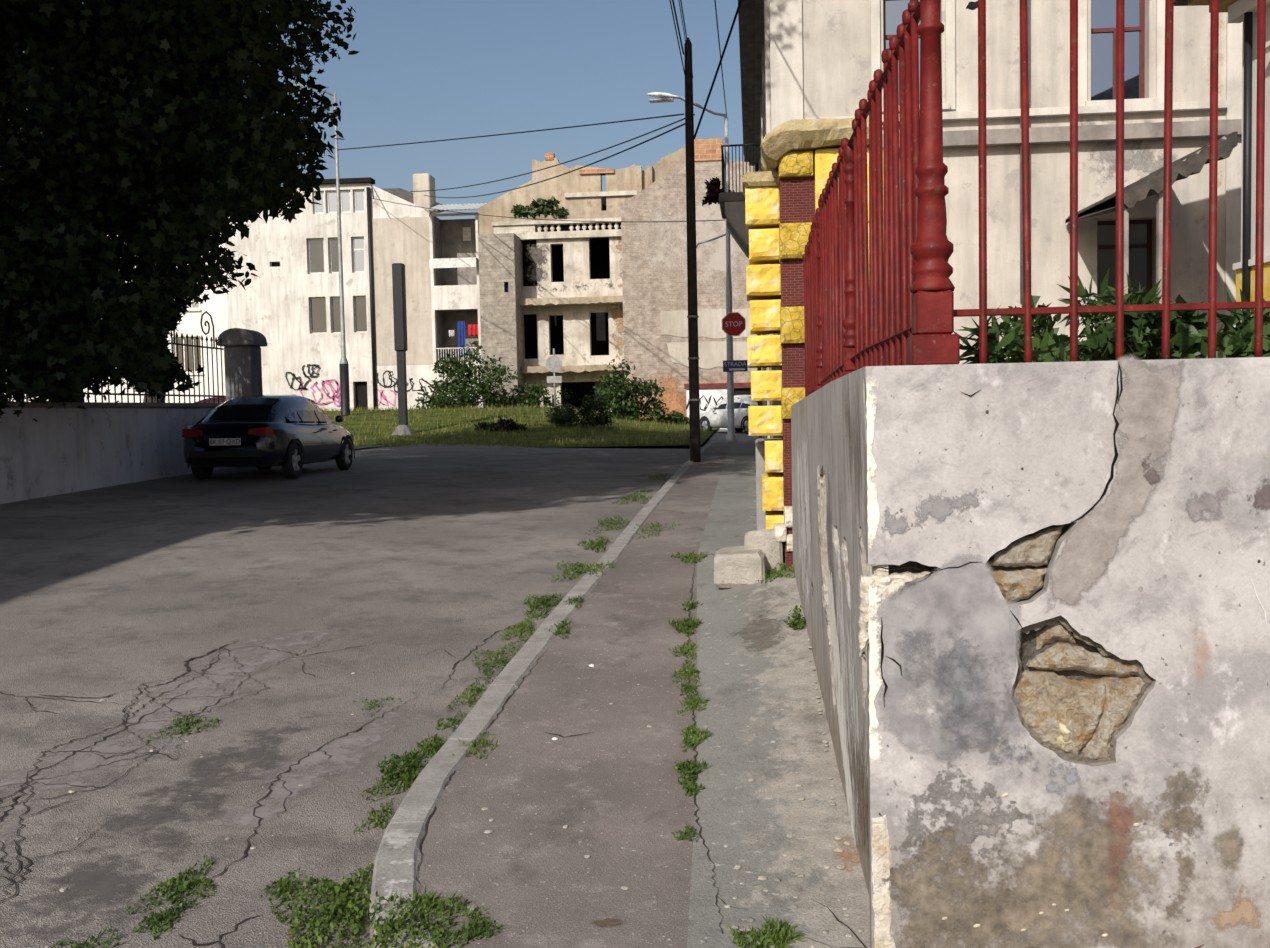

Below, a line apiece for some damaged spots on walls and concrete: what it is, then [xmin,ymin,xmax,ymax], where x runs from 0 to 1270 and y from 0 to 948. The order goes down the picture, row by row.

crack [1067,361,1123,526]
crack [801,483,977,655]
flaking render [987,357,1183,764]
water stain [900,633,1032,774]
water stain [883,762,1209,948]
water stain [1217,830,1243,869]
water stain [1214,885,1261,929]